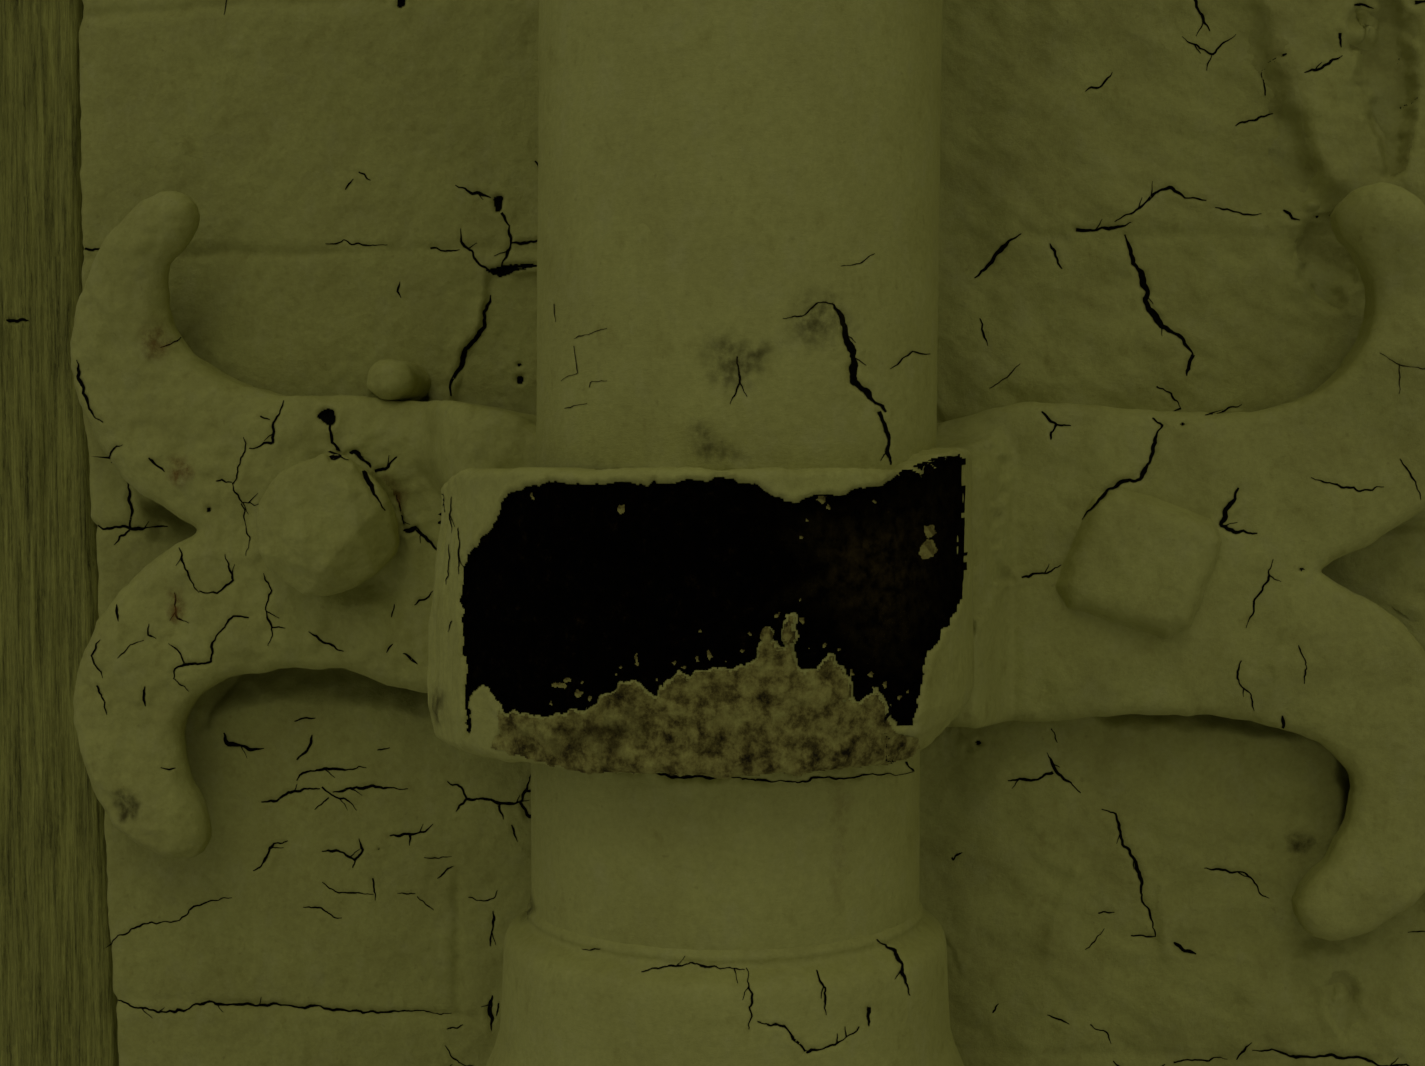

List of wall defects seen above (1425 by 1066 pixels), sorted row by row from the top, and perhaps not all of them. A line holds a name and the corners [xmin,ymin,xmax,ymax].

crack [1235,3,1374,126]
crack [430,185,537,396]
crack [783,301,928,465]
crack [974,181,1330,519]
crack [328,426,465,664]
peeling [460,454,968,779]
crack [223,733,264,758]
crack [261,717,531,946]
crack [1008,729,1196,954]
crack [641,956,871,1054]
crack [876,939,910,995]
crack [1162,1042,1409,1066]